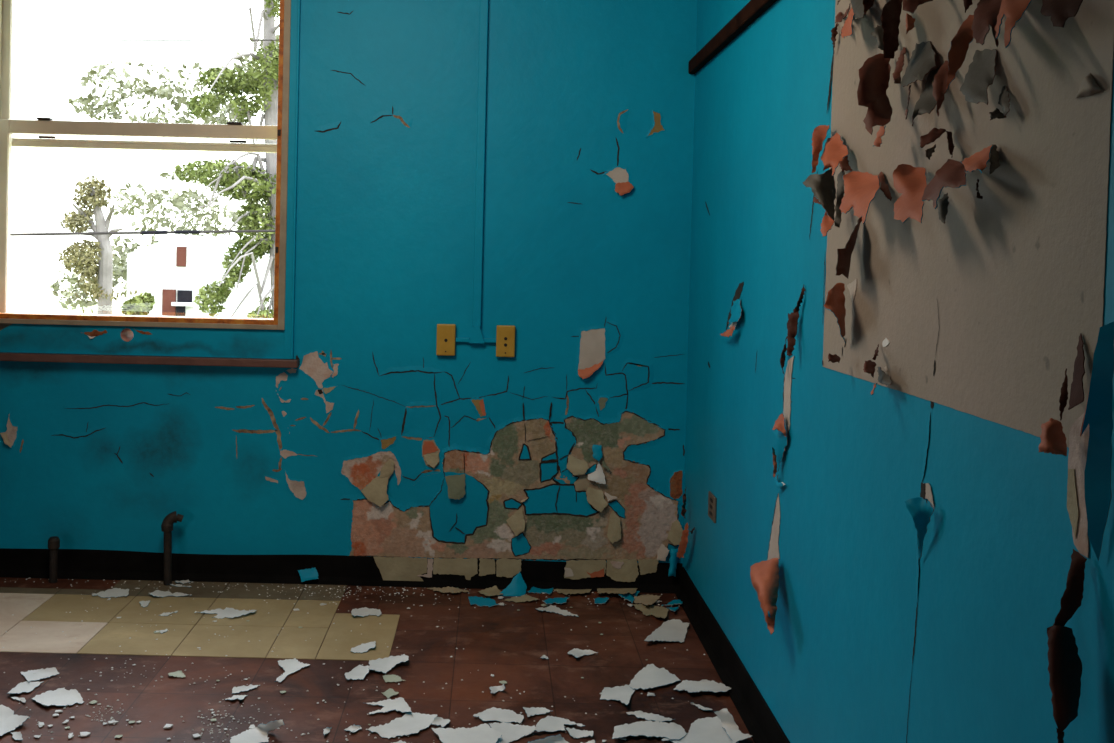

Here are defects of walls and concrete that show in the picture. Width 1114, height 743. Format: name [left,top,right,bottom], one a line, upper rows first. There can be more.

crack [314,121,341,133]
crack [370,106,413,128]
crack [617,109,629,133]
peeling [590,138,634,195]
peeling [721,282,744,337]
peeling [571,319,624,382]
peeling [803,0,1114,743]
crack [51,392,190,464]
flaking render [215,349,342,502]
crack [331,351,685,481]
peeling [750,285,805,635]
peeling [338,395,695,617]